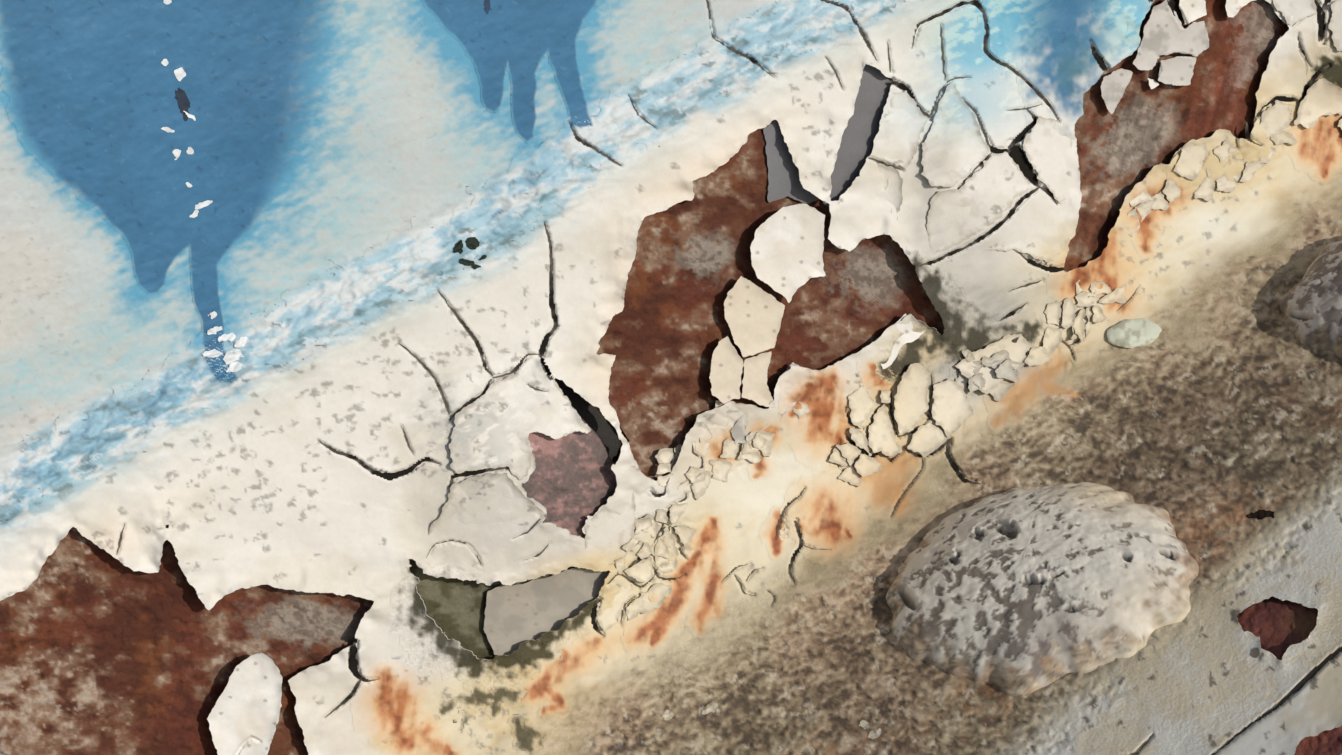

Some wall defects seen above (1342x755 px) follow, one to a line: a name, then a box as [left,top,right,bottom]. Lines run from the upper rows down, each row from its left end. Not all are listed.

crack [821,0,1066,322]
crack [398,221,558,421]
peeling [409,0,1342,660]
peeling [0,525,374,755]
rust [350,659,466,755]
crack [318,427,509,487]
rust [515,512,734,721]
crack [591,444,704,635]
crack [722,488,831,605]
rust [695,353,929,567]
crack [837,374,981,517]
peeling [1294,725,1342,755]